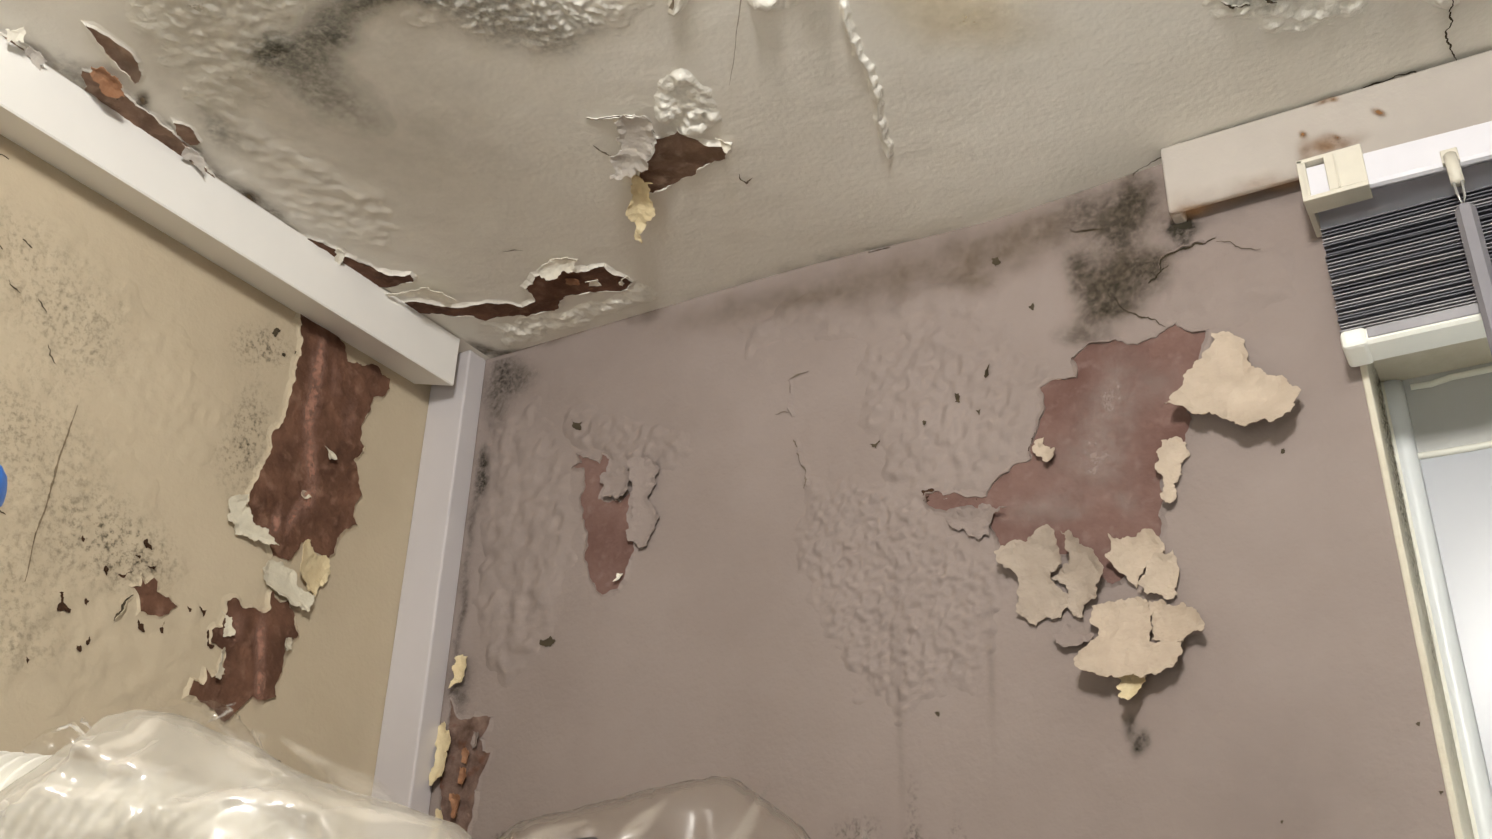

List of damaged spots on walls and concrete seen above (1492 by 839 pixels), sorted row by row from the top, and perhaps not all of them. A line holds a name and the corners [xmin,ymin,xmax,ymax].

peeling [77,21,220,180]
mould [254,21,346,73]
peeling [302,233,637,321]
peeling [610,68,733,244]
leakage [1074,255,1157,313]
leakage [1167,217,1196,244]
peeling [103,313,390,726]
peeling [571,451,660,600]
peeling [921,319,1301,700]
peeling [57,592,89,613]
leakage [539,636,555,647]
peeling [429,654,496,839]